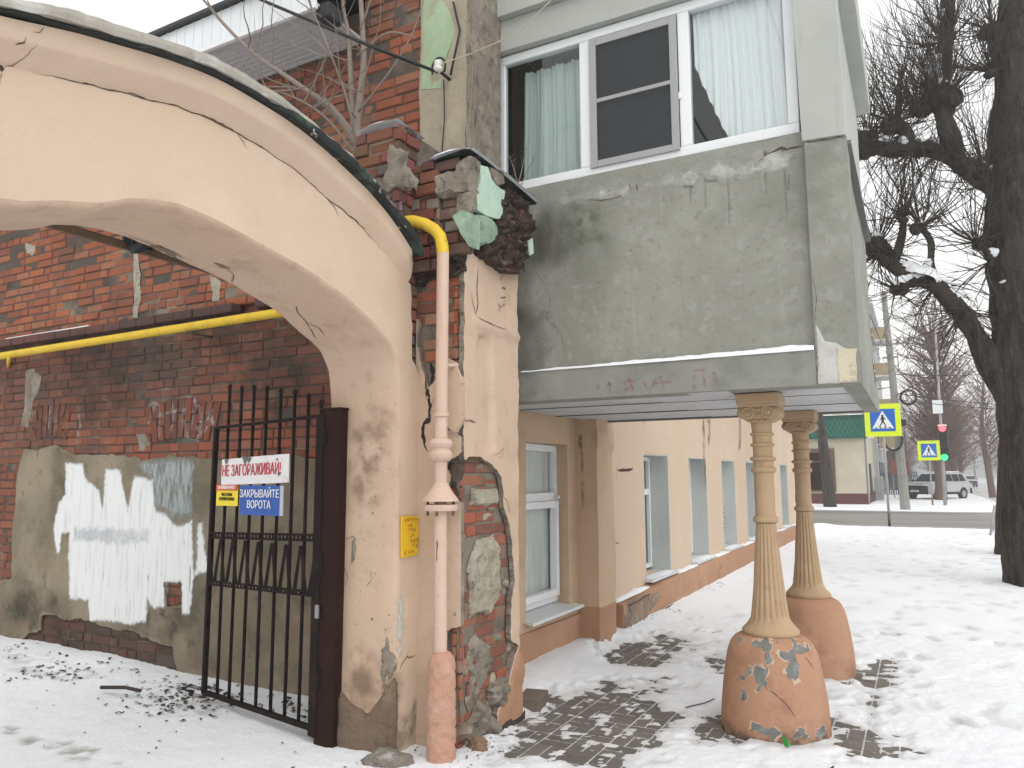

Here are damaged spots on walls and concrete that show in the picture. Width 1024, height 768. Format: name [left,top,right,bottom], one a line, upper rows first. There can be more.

crack [0,27,381,249]
efflorescence [657,150,794,187]
peeling [452,157,505,250]
crack [471,262,565,357]
spalling [816,325,857,384]
crack [421,363,435,451]
spalling [624,591,661,629]
spalling [337,614,398,752]
spalling [456,672,511,741]
peeling [736,636,811,702]
peeling [748,721,826,742]